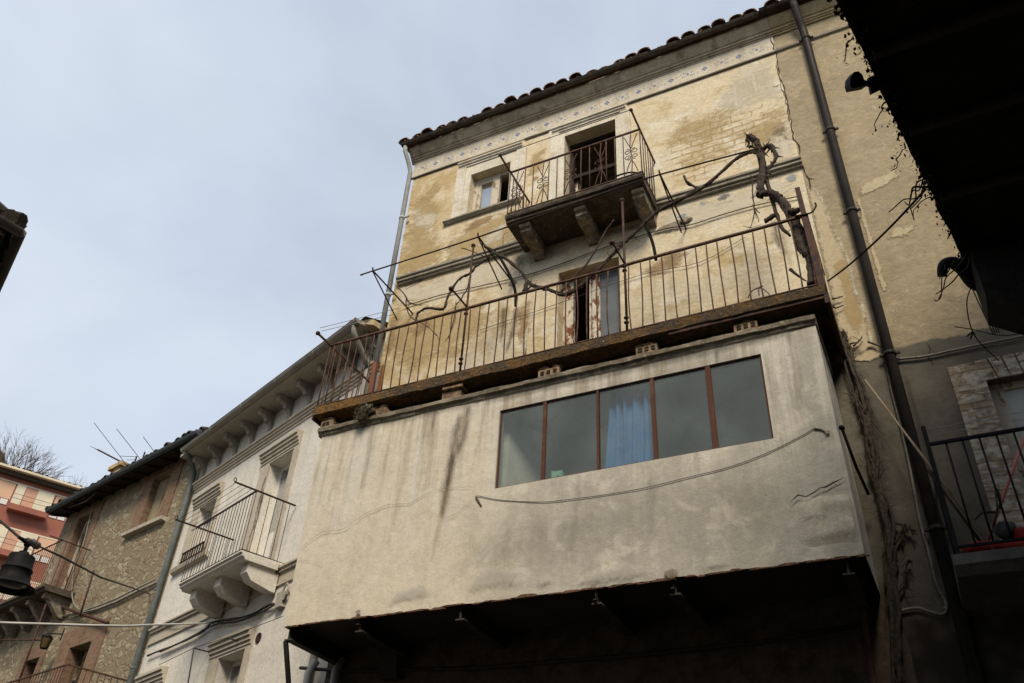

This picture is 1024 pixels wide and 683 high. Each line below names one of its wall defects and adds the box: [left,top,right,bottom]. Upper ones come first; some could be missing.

peeling [668,60,793,179]
flaking render [807,188,882,362]
peeling [856,171,899,291]
peeling [887,225,916,239]
crack [790,478,843,520]